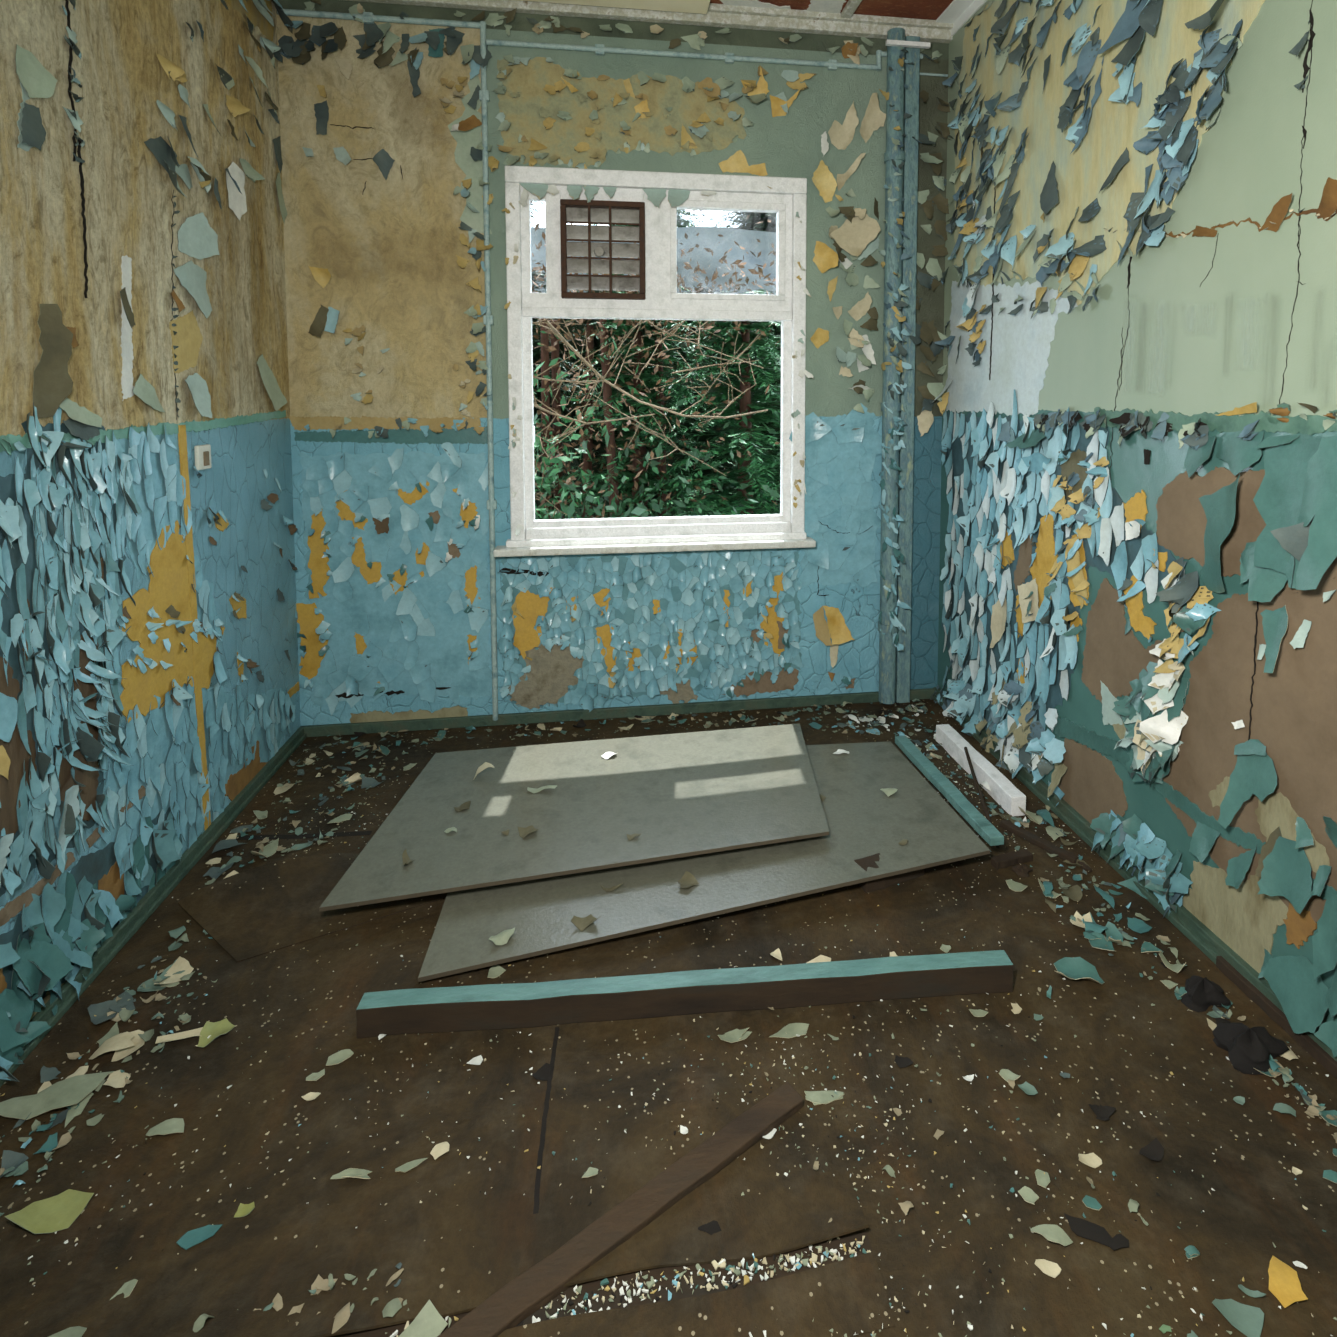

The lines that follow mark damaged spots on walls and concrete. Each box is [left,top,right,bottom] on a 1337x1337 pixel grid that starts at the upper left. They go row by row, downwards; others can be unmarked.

peeling [720,0,846,13]
crack [62,0,88,298]
peeling [0,0,816,926]
peeling [792,0,1337,1057]
crack [940,0,1337,754]
flaking render [0,862,136,1082]
peeling [155,1018,235,1047]
peeling [770,1023,809,1038]
peeling [804,1090,843,1105]
peeling [1323,1170,1337,1183]